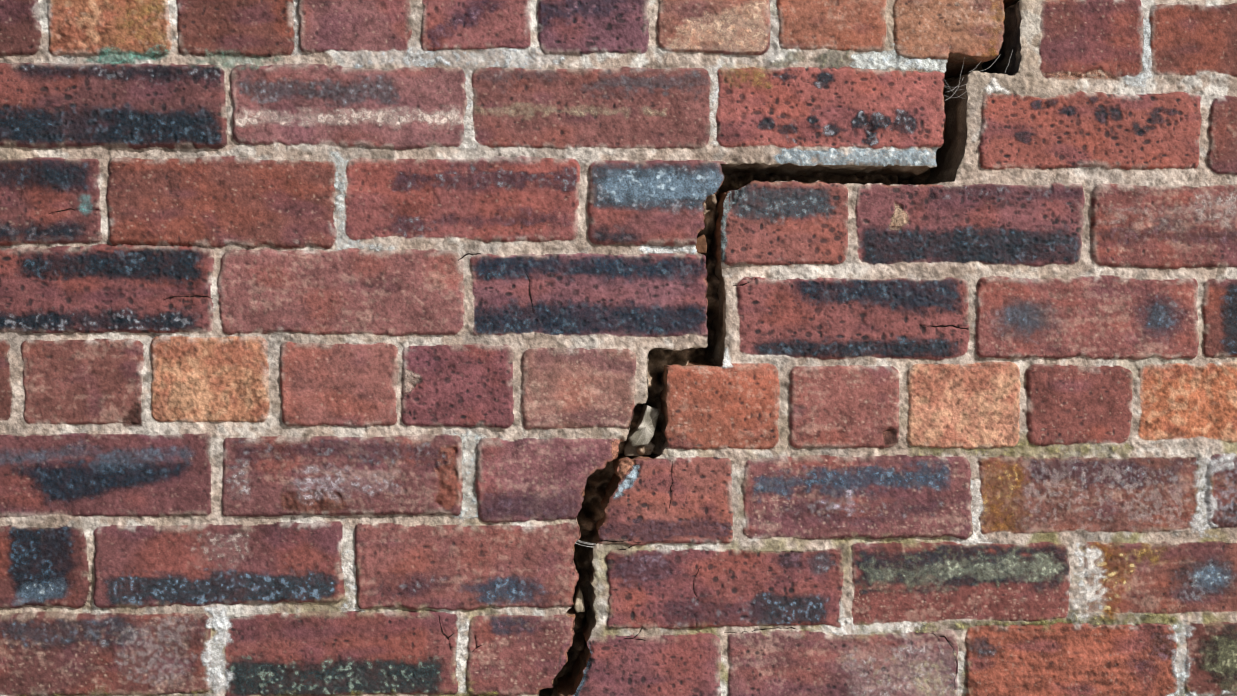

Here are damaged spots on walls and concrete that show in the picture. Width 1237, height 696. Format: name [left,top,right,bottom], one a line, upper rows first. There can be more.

crack [539,0,1022,696]